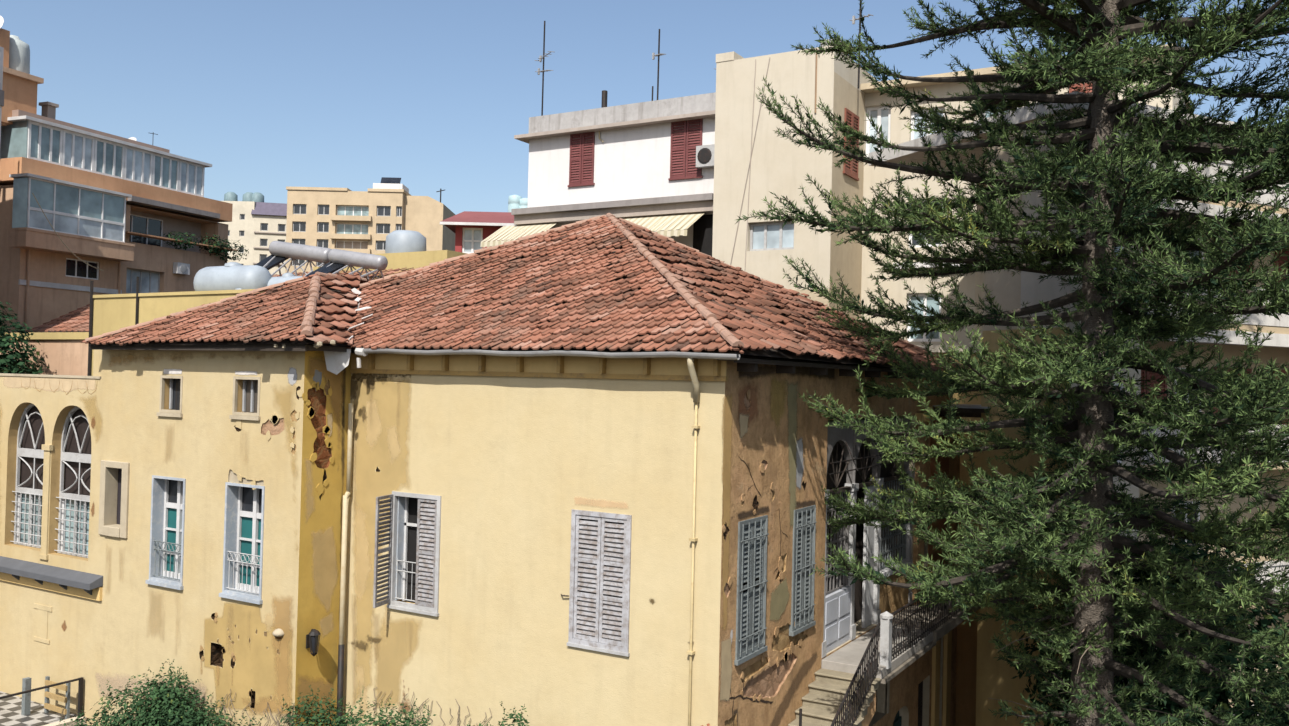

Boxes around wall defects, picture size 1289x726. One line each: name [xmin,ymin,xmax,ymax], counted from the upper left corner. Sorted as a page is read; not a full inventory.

flaking render [261,369,334,501]
water stain [310,358,418,706]
spalling [199,612,280,668]